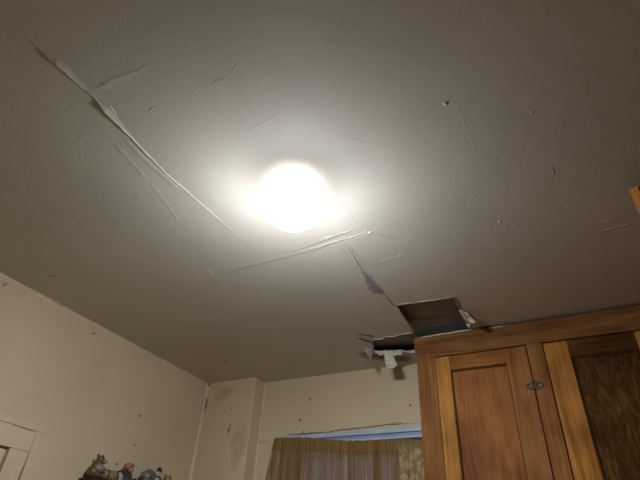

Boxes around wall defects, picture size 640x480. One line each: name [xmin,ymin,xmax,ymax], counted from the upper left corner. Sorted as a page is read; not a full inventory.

crack [18,28,287,264]
spalling [373,297,470,351]